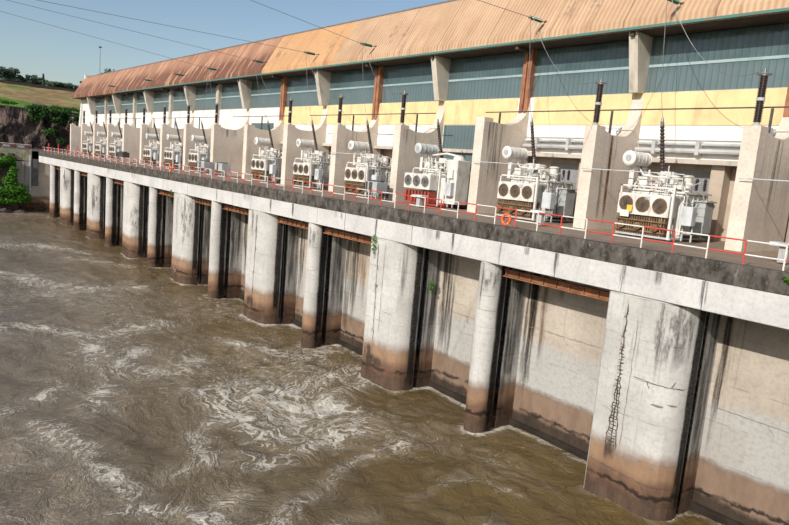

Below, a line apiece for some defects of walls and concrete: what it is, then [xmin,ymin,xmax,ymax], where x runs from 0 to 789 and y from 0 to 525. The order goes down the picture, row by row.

leakage [18,166,789,525]
crack [528,310,682,491]